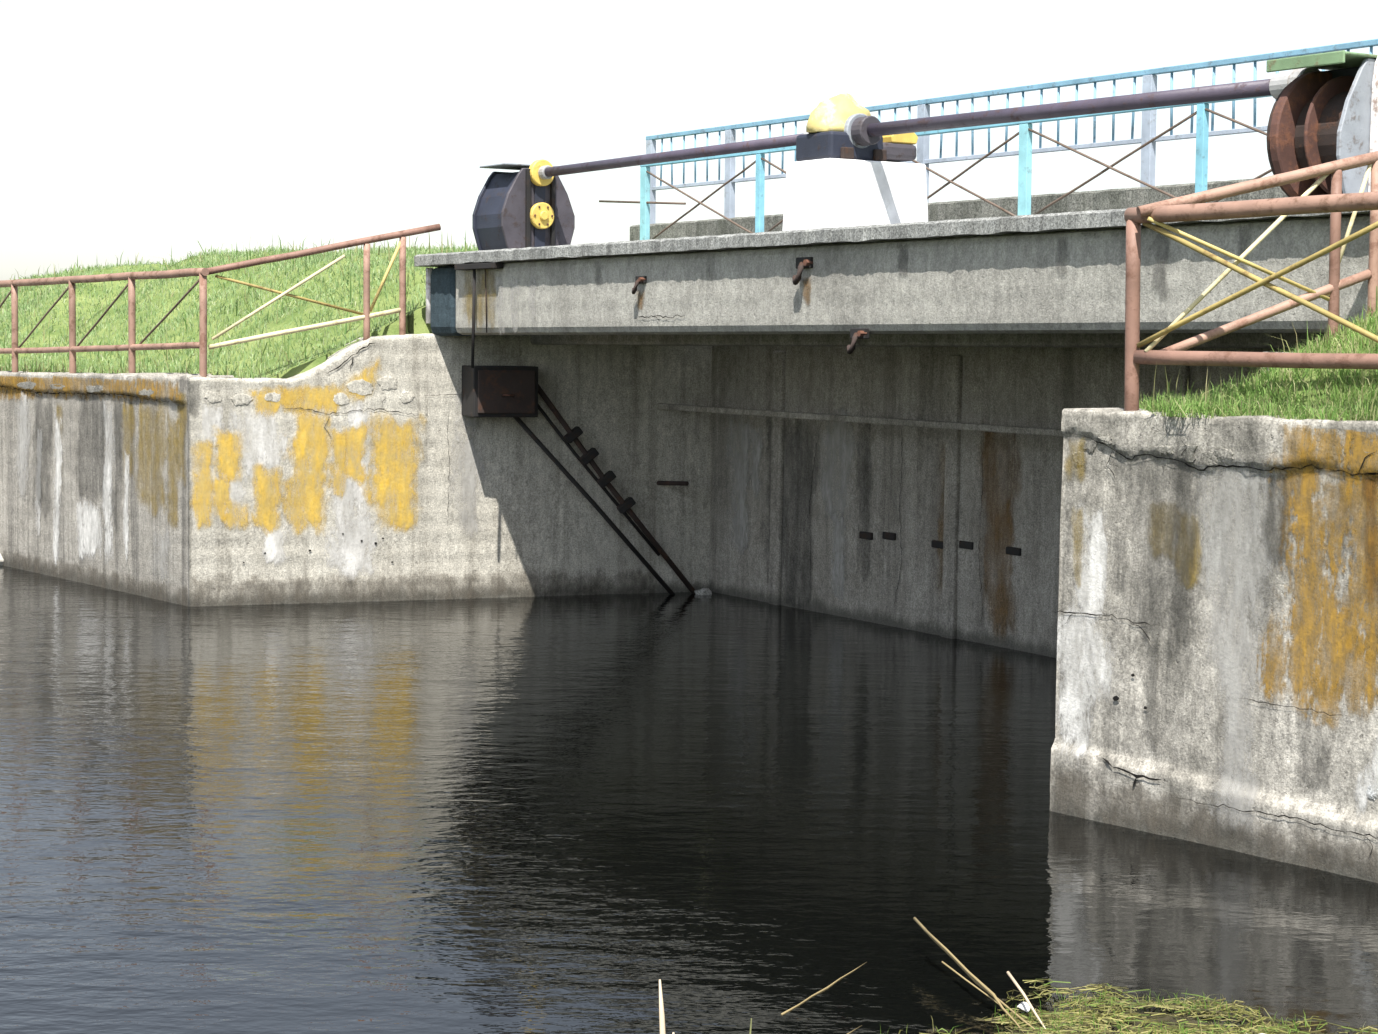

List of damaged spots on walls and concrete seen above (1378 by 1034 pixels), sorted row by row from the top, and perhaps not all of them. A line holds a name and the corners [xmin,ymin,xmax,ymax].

damp [0,376,204,607]
crack [1072,433,1378,478]
damp [238,576,311,604]
crack [1103,758,1377,859]
damp [1355,738,1378,811]